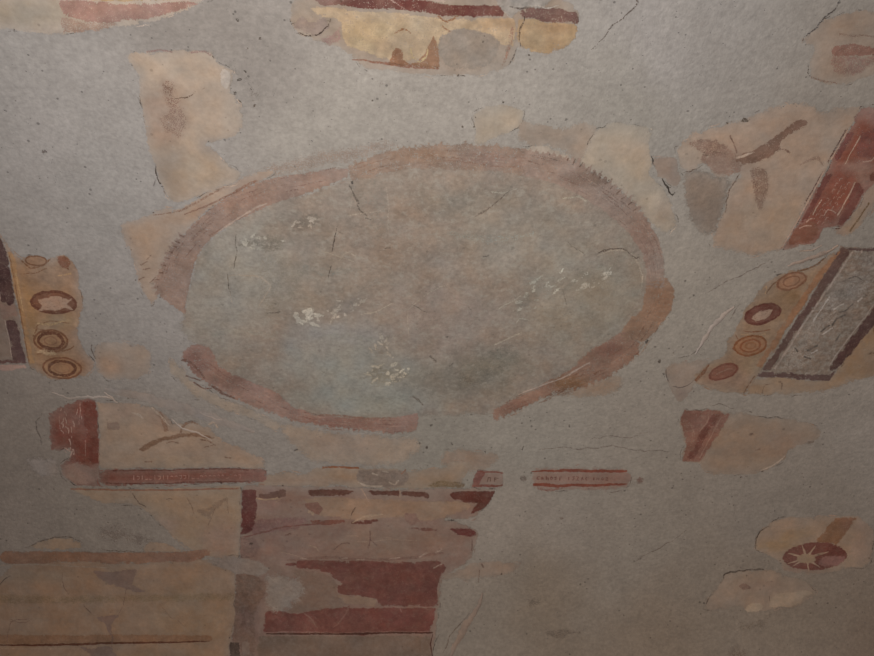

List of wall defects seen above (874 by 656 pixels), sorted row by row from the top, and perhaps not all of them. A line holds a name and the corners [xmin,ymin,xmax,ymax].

crack [591,0,638,50]